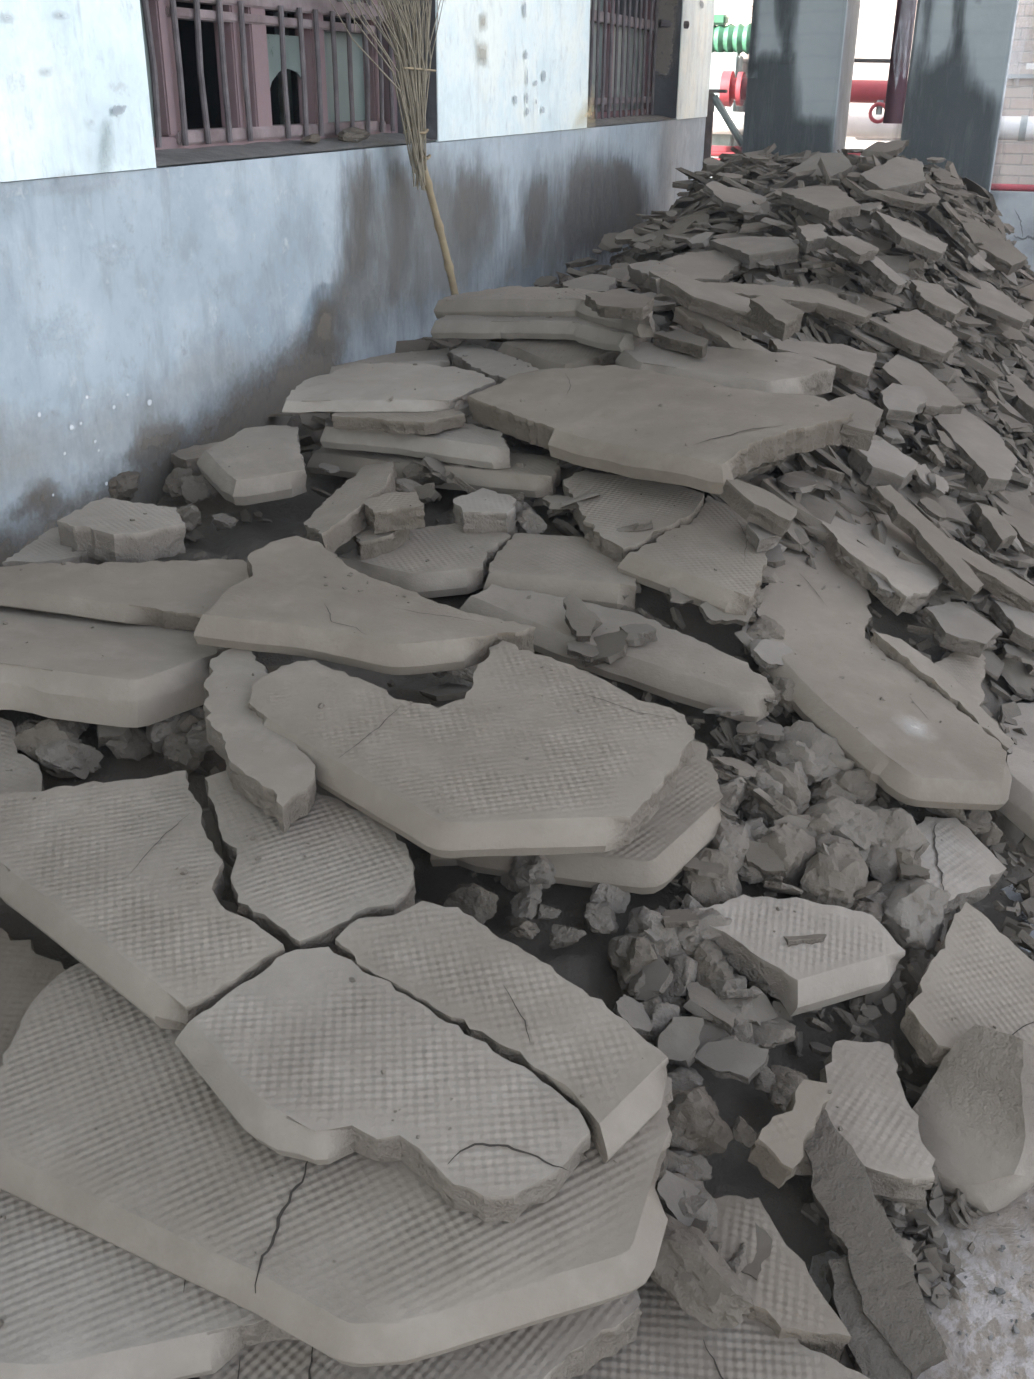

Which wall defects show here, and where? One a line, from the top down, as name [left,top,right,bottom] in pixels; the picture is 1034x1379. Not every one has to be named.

damp [737,0,832,156]
damp [855,22,888,59]
damp [898,0,998,194]
damp [336,163,496,327]
damp [506,164,649,283]